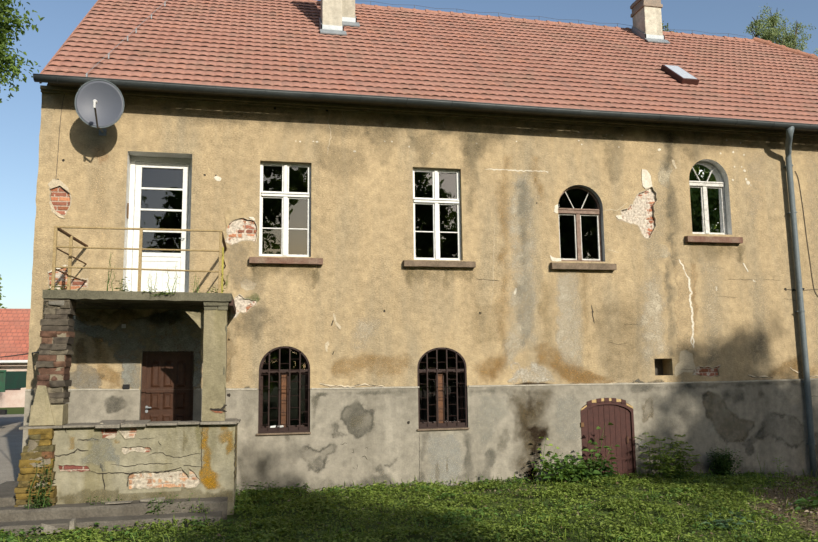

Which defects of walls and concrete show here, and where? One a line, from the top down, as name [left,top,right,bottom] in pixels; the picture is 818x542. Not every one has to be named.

spalling [48,179,72,218]
spalling [225,207,258,246]
spalling [616,169,658,239]
spalling [47,264,88,290]
spalling [228,294,258,319]
crack [679,260,695,348]
damp [69,309,202,389]
crack [210,314,227,413]
damp [509,274,594,473]
damp [341,403,374,438]
crack [54,428,203,491]
spalling [127,467,202,491]